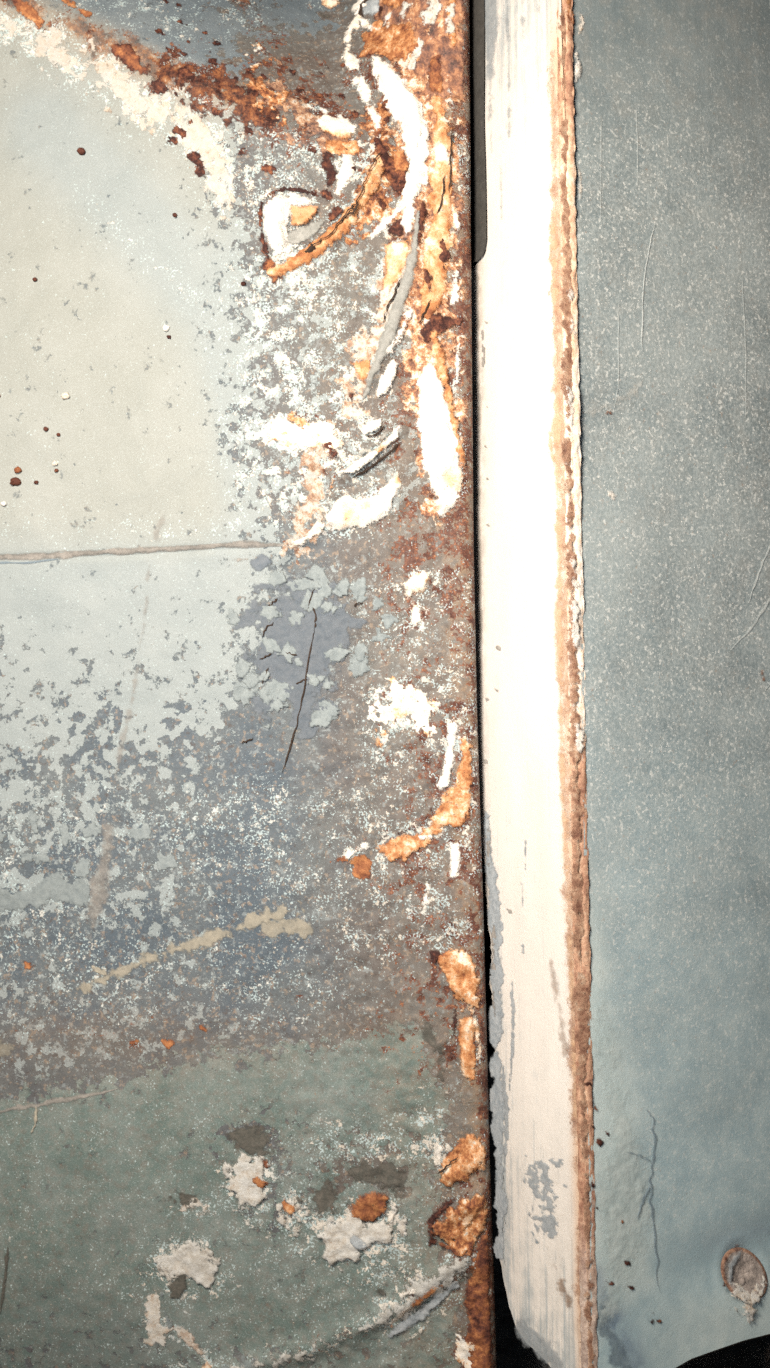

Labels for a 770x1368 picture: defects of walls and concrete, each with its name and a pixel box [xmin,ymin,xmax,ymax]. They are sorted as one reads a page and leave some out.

rust [2,0,45,30]
rust [111,0,468,565]
peeling [264,330,465,550]
crack [282,608,317,772]
peeling [226,562,458,790]
rust [547,10,635,1368]
rust [336,736,474,879]
peeling [449,842,461,878]
rust [429,948,484,1081]
spalling [143,1238,221,1368]
spalling [220,1125,413,1271]
rust [426,1134,493,1368]